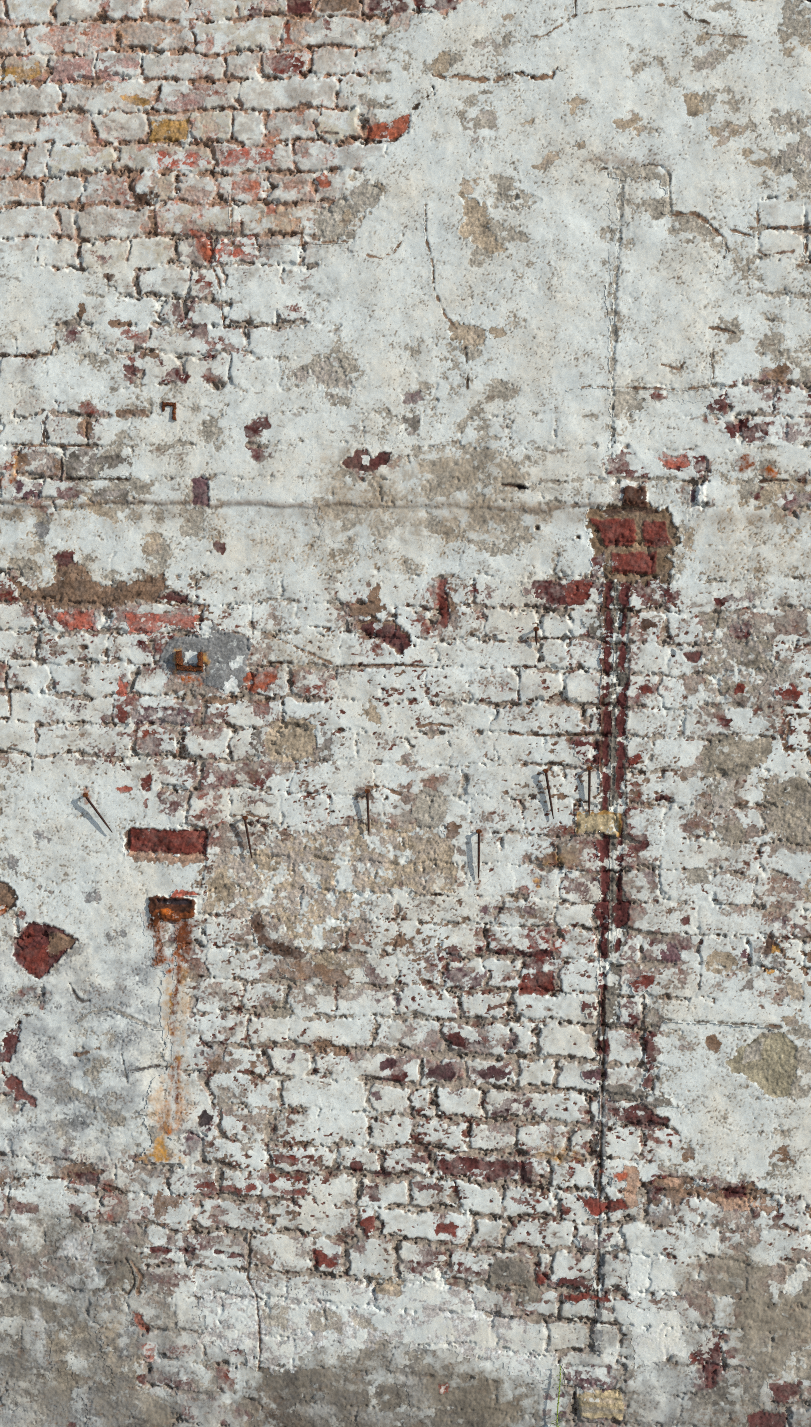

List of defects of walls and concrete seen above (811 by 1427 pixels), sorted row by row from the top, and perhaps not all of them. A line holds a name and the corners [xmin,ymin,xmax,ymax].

spalling [317,111,412,144]
crack [212,189,470,390]
crack [13,340,57,359]
crack [5,419,129,482]
rust [168,645,212,690]
flaking render [115,655,462,1013]
spalling [12,921,79,979]
rust [134,908,205,1167]
spalling [371,1031,549,1118]
spalling [434,945,556,999]
spalling [600,942,682,1130]
flaking render [704,912,804,1099]